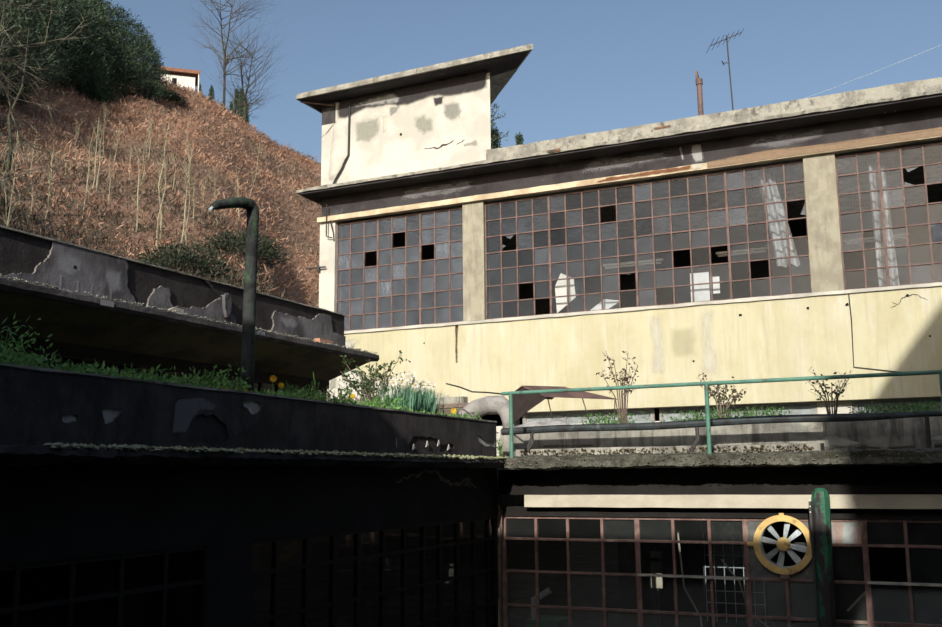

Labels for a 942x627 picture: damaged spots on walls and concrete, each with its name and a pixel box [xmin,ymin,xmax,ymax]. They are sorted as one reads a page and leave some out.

damp [356,94,399,140]
damp [417,117,431,131]
damp [434,97,460,119]
flaking render [0,228,54,276]
flaking render [243,400,261,415]
flaking render [187,414,229,446]